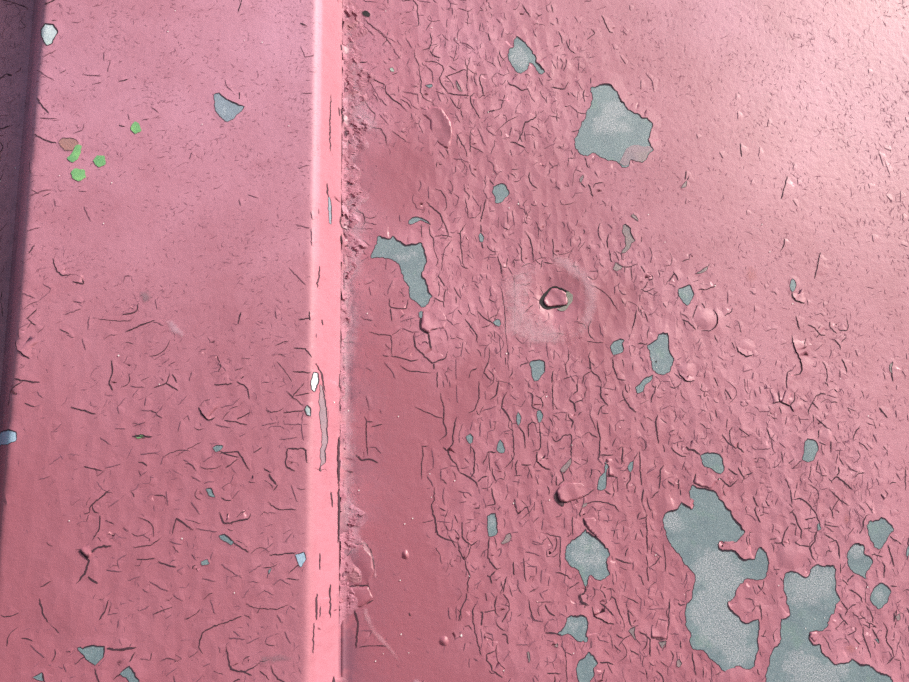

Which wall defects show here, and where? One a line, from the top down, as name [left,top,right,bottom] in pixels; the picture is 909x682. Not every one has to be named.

peeling [502,26,555,79]
peeling [206,86,252,127]
peeling [567,70,662,173]
peeling [364,208,446,333]
crack [0,0,387,682]
peeling [605,329,630,359]
crack [327,0,909,682]
peeling [630,318,683,396]
spalling [301,367,336,471]
peeling [552,455,619,682]
peeling [651,441,904,682]